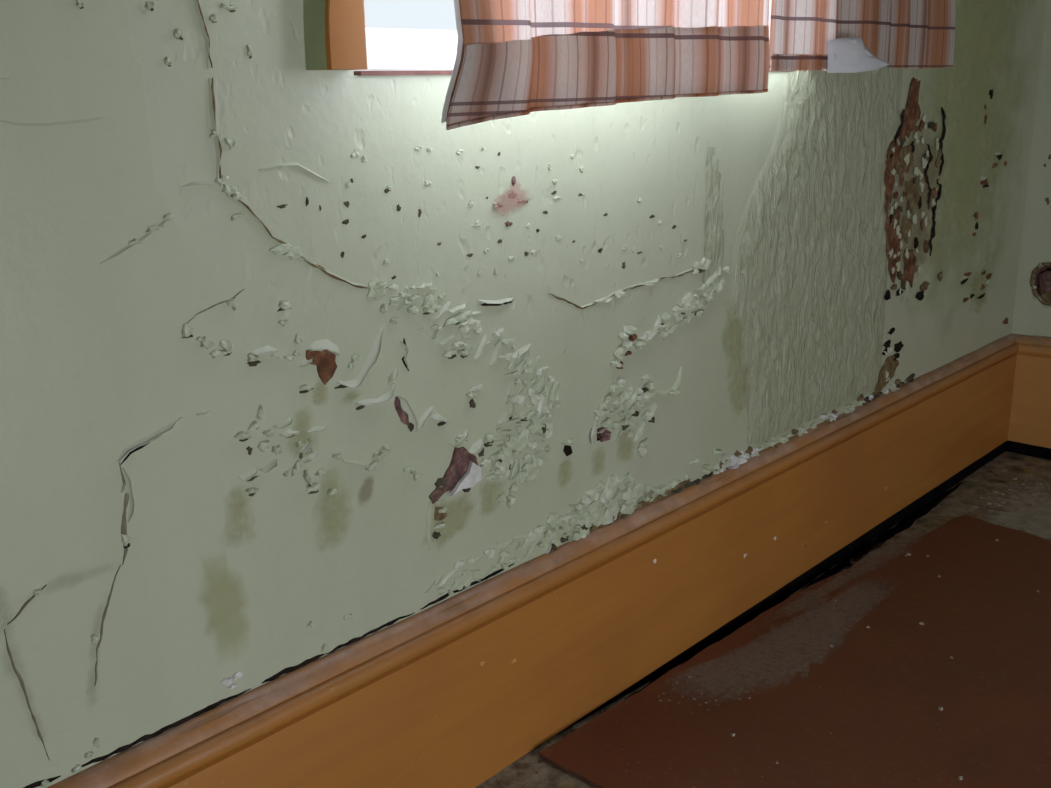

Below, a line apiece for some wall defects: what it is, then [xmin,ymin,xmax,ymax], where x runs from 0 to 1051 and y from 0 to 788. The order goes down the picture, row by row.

peeling [979,151,1007,188]
crack [90,410,210,686]
peeling [181,289,244,359]
peeling [234,258,573,551]
peeling [590,266,730,458]
spalling [424,373,915,596]
peeling [960,270,993,303]
spalling [1029,262,1051,309]